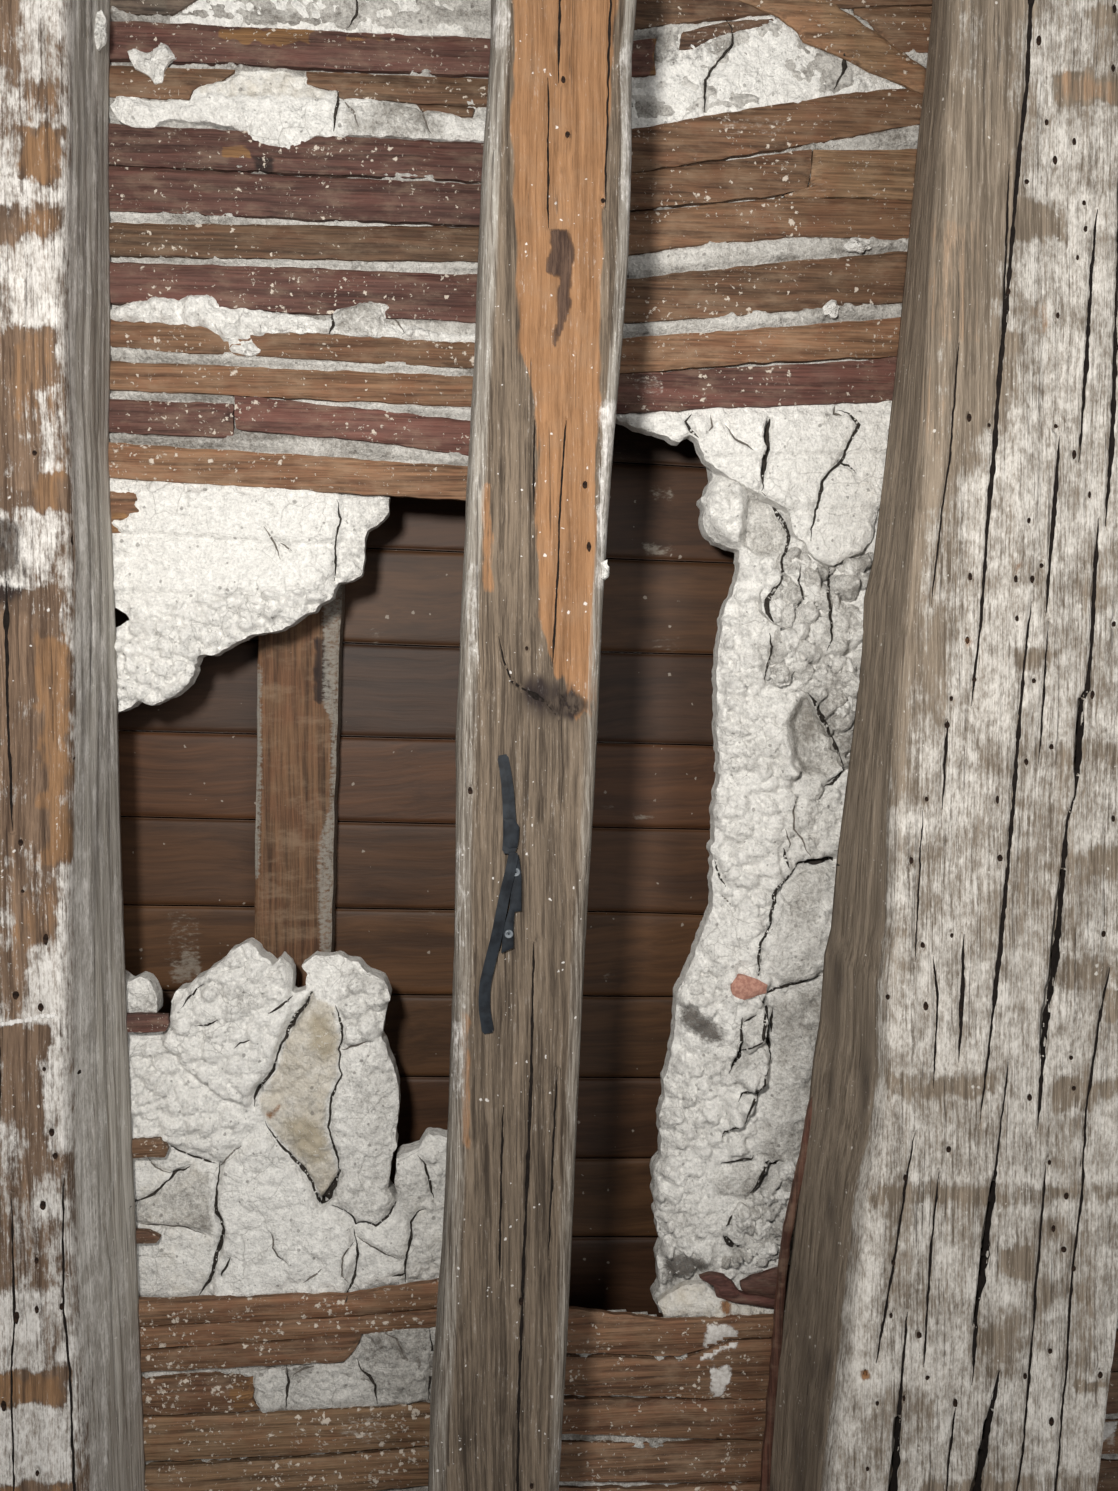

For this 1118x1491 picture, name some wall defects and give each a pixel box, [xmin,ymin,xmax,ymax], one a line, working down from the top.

crack [333,89,359,131]
crack [349,0,359,27]
crack [547,0,561,228]
crack [604,0,612,208]
crack [684,406,861,680]
crack [915,0,1118,1491]
spalling [730,974,768,1000]
crack [722,693,845,1247]
crack [130,984,434,1302]
flaking render [657,1279,774,1318]
flaking render [721,1159,796,1269]
crack [876,1133,939,1491]